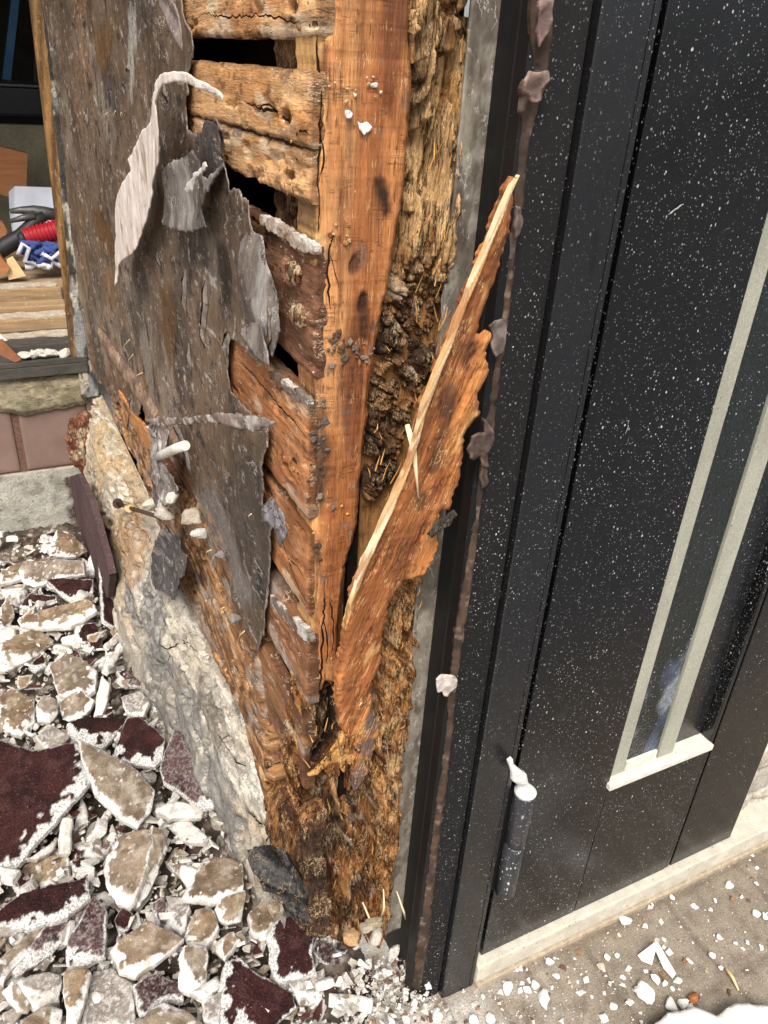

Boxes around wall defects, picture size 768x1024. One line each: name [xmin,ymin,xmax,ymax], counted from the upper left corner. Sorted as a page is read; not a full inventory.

peeling [328,76,383,136]
crack [202,12,339,306]
peeling [327,222,362,246]
peeling [319,325,375,369]
peeling [306,398,334,483]
peeling [427,510,457,538]
spalling [195,676,228,748]
spalling [309,683,340,765]